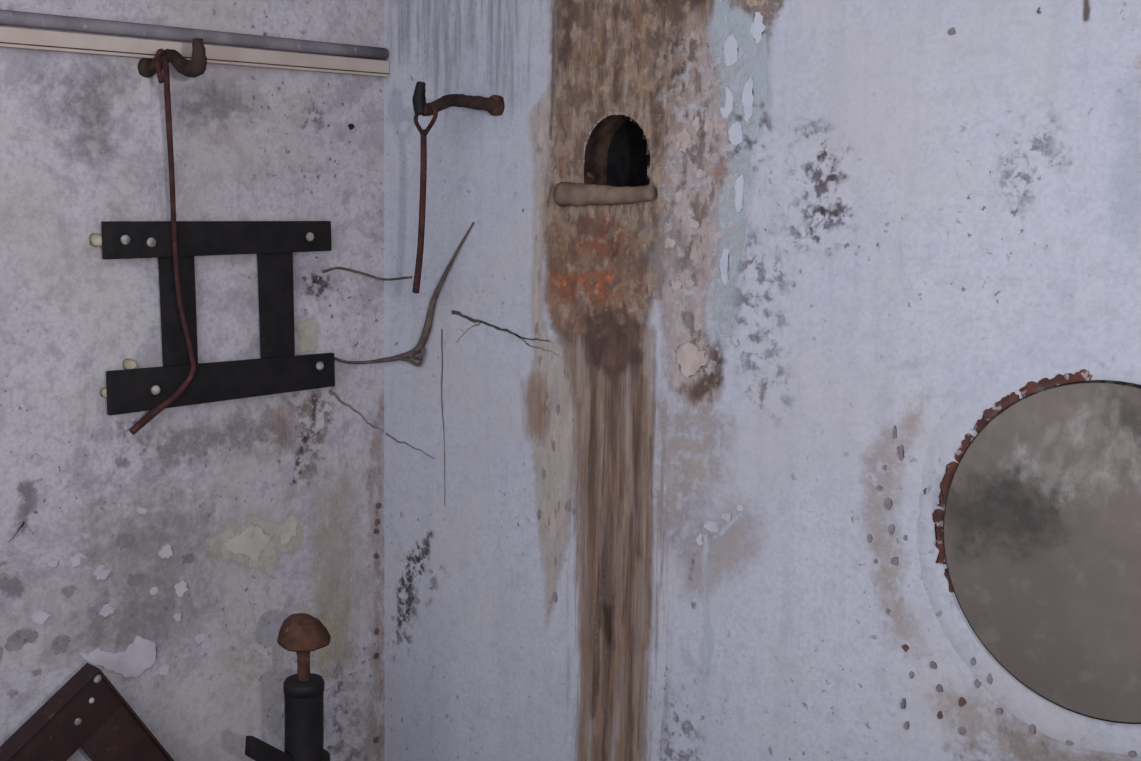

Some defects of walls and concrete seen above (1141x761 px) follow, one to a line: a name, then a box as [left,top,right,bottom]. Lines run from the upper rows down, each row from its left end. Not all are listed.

leakage [796,143,846,243]
leakage [528,0,714,613]
spalling [8,483,36,543]
spalling [0,563,23,597]
peeling [158,543,193,564]
peeling [174,580,188,597]
leakage [397,531,435,643]
peeling [0,610,51,659]
flaking render [52,604,170,678]